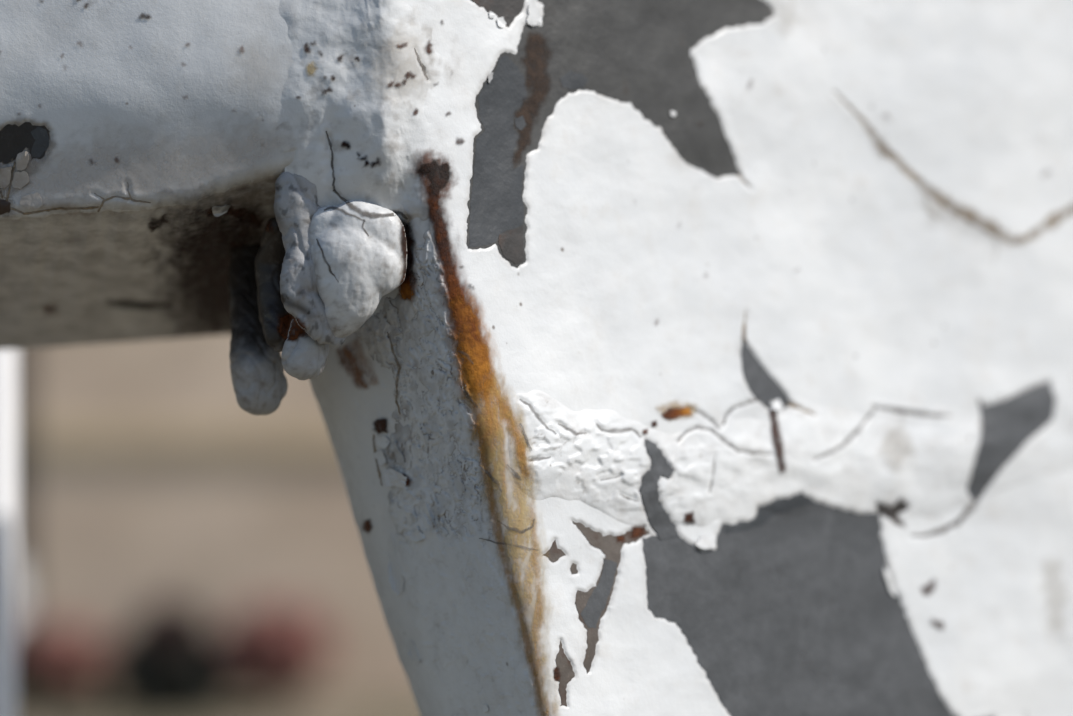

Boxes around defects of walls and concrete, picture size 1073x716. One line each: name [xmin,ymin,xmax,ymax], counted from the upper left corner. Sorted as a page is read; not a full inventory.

peeling [0,122,50,215]
crack [0,162,151,215]
crack [324,131,407,236]
peeling [467,0,774,268]
crack [846,104,1073,244]
rust [428,197,549,716]
crack [524,402,641,437]
rust [643,405,692,434]
crack [677,421,772,455]
peeling [723,312,816,425]
peeling [543,539,578,574]
peeling [554,381,1056,716]